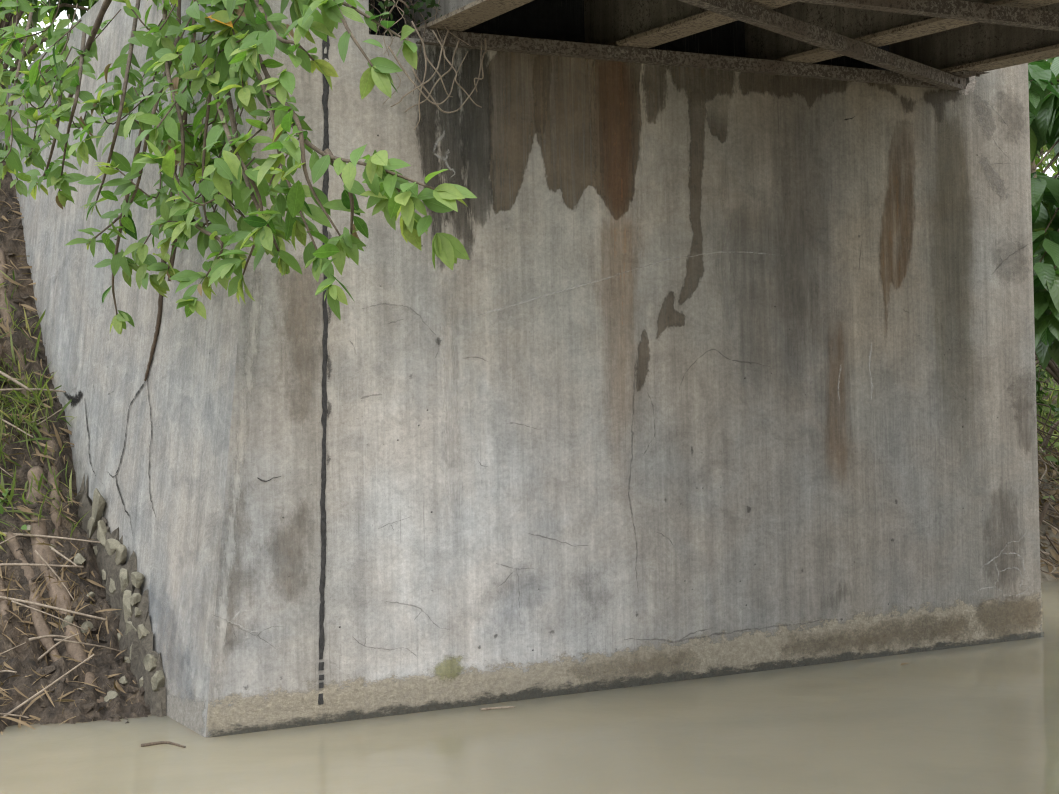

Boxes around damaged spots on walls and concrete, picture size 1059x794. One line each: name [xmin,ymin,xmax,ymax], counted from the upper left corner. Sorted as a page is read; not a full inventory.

leakage [414,46,848,391]
rust [880,154,913,314]
crack [85,357,155,534]
leakage [149,547,1044,738]